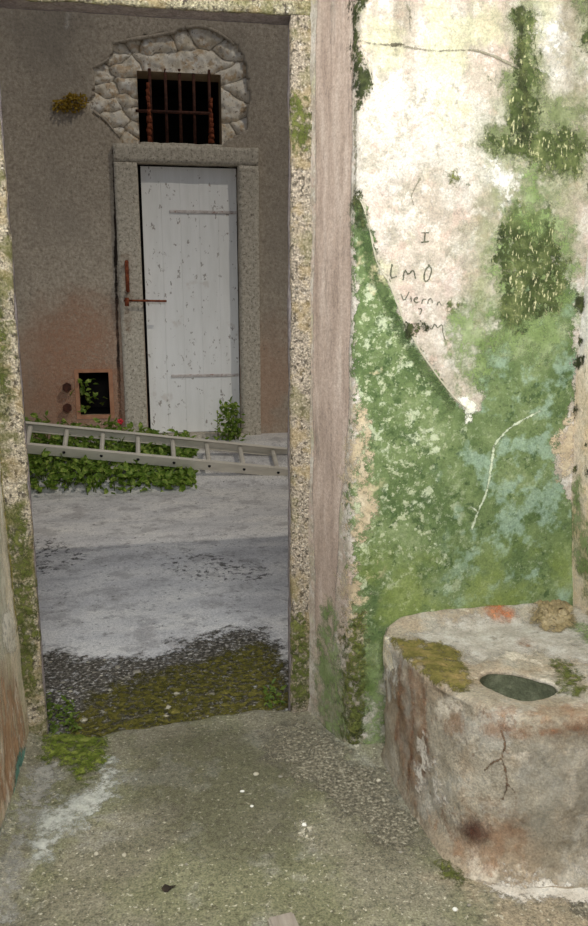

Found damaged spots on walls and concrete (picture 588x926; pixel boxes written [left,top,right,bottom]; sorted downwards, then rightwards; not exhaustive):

crack [358,5,520,69]
damp [350,205,456,410]
crack [484,730,515,800]